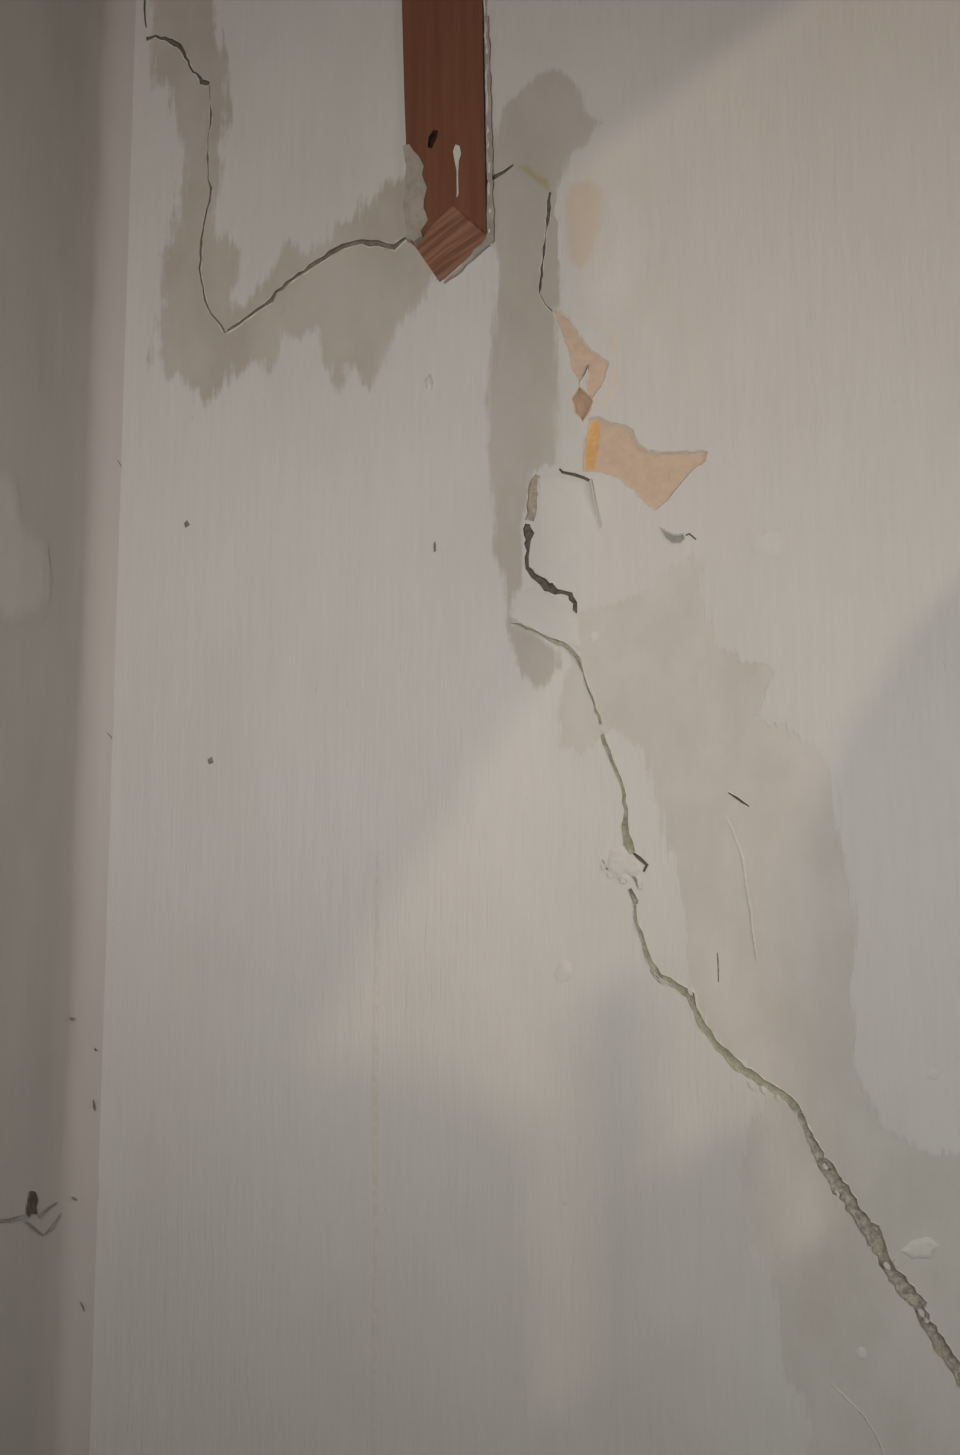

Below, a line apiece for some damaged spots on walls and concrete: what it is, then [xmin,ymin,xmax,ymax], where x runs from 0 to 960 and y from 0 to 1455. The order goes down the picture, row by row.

crack [143,0,407,334]
water stain [137,0,444,429]
flaking render [552,307,709,545]
crack [511,468,960,1388]